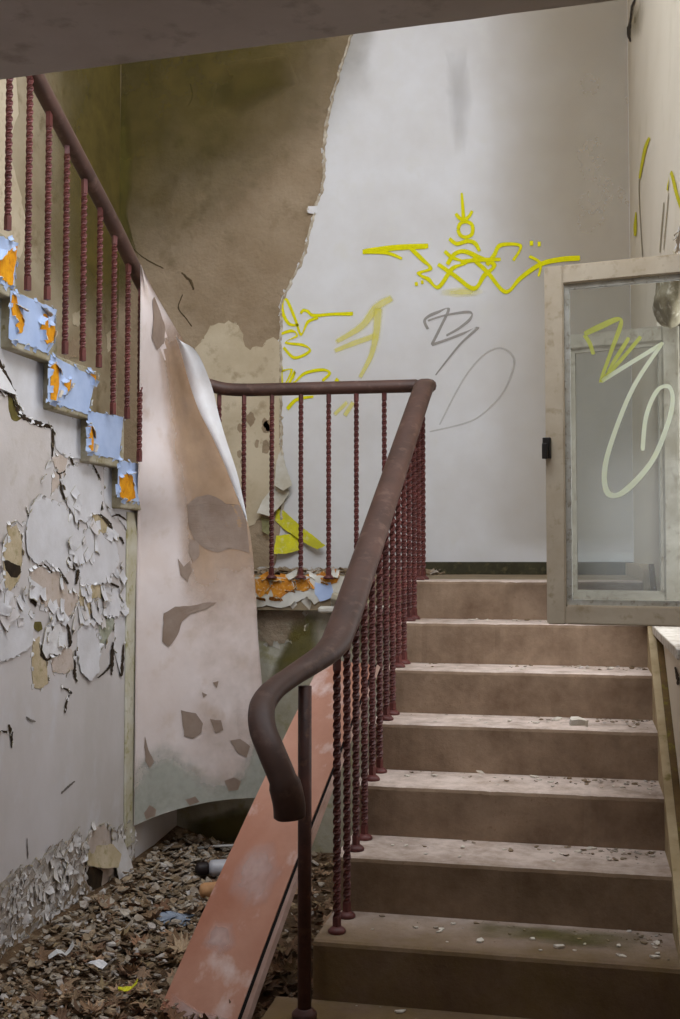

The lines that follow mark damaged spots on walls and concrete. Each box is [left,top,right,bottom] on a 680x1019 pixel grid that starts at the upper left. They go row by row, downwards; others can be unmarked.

peeling [0,34,353,959]